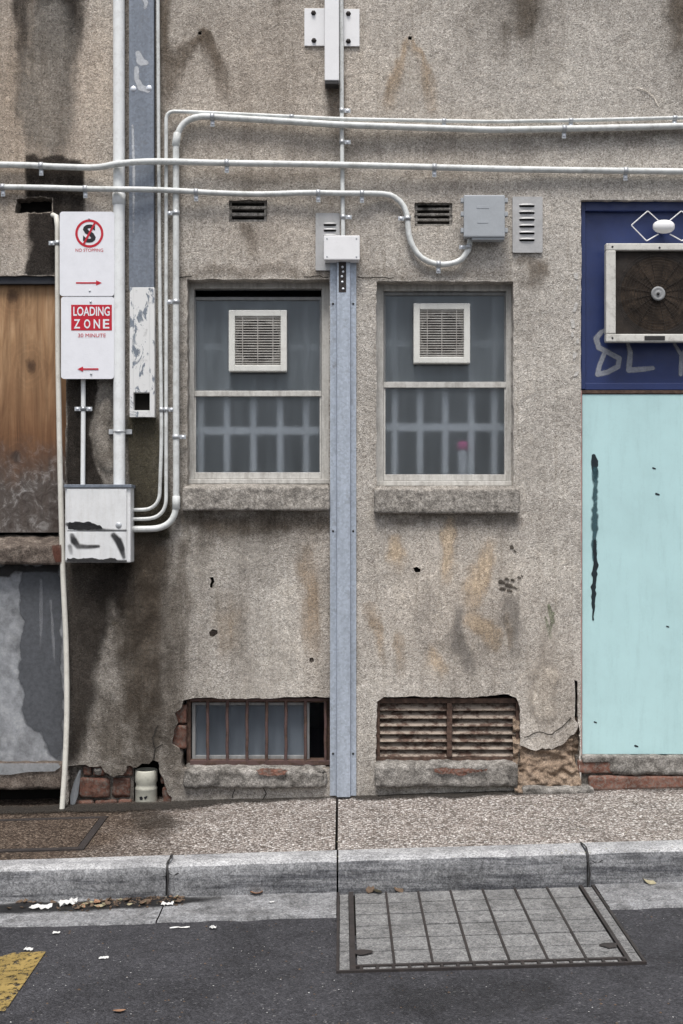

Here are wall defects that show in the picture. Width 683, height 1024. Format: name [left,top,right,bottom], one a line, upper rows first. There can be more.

leakage [155,0,222,80]
leakage [13,0,85,275]
leakage [67,416,330,760]
leakage [451,610,469,660]
peeling [0,564,172,804]
crack [524,718,571,738]
spalling [512,717,594,795]